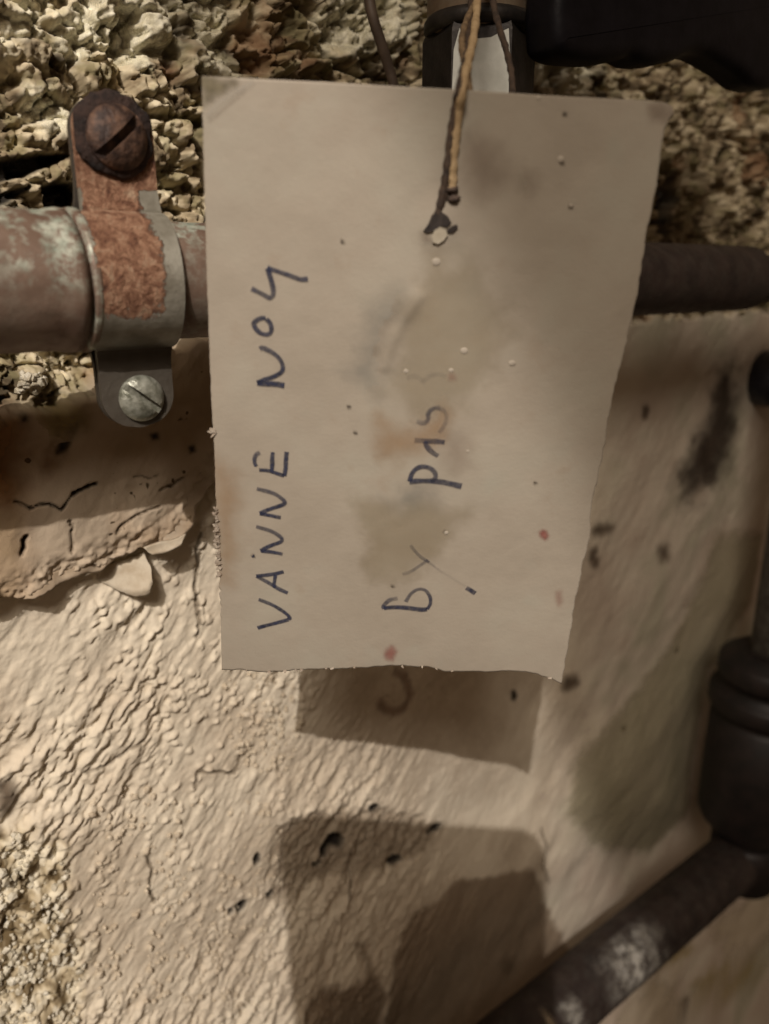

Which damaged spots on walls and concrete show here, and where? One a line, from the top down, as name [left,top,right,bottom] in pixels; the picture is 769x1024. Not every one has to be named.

damp [680,375,736,494]
crack [27,482,96,510]
flaking render [11,474,215,600]